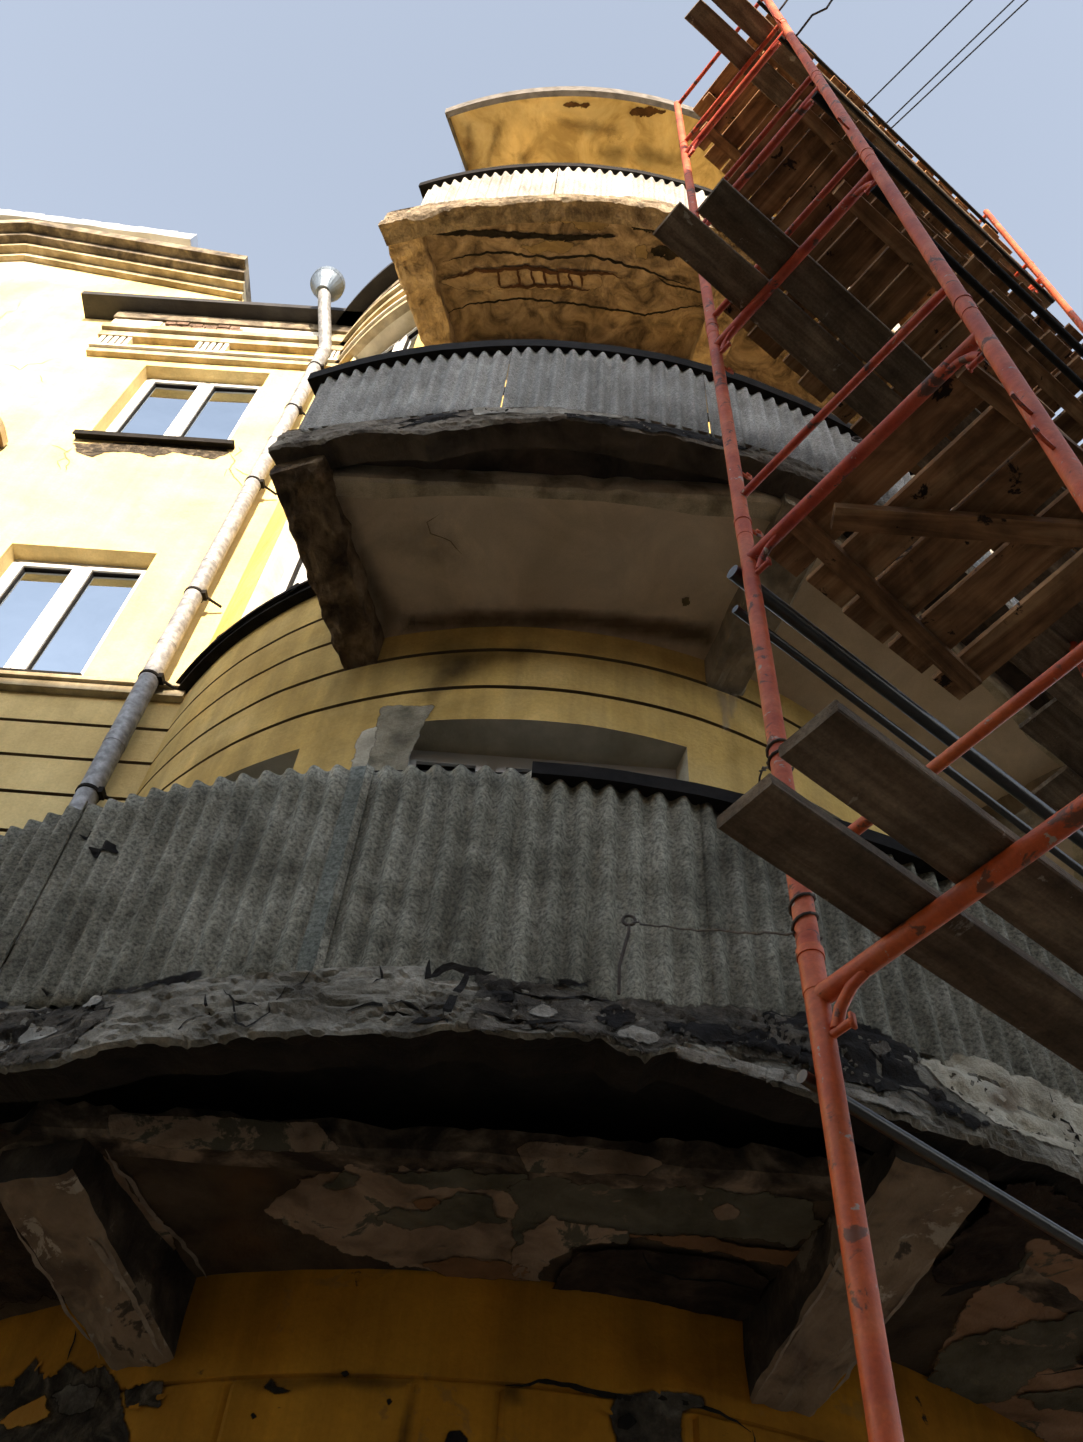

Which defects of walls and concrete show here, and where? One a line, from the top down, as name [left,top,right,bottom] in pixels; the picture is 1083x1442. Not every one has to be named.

crack [53,445,72,470]
crack [224,448,248,486]
spalling [0,970,203,1066]
spalling [467,914,815,1091]
spalling [837,1023,990,1131]
spalling [884,1181,1083,1324]
peeling [0,1202,166,1442]
crack [505,1379,756,1442]
peeling [604,1385,705,1442]